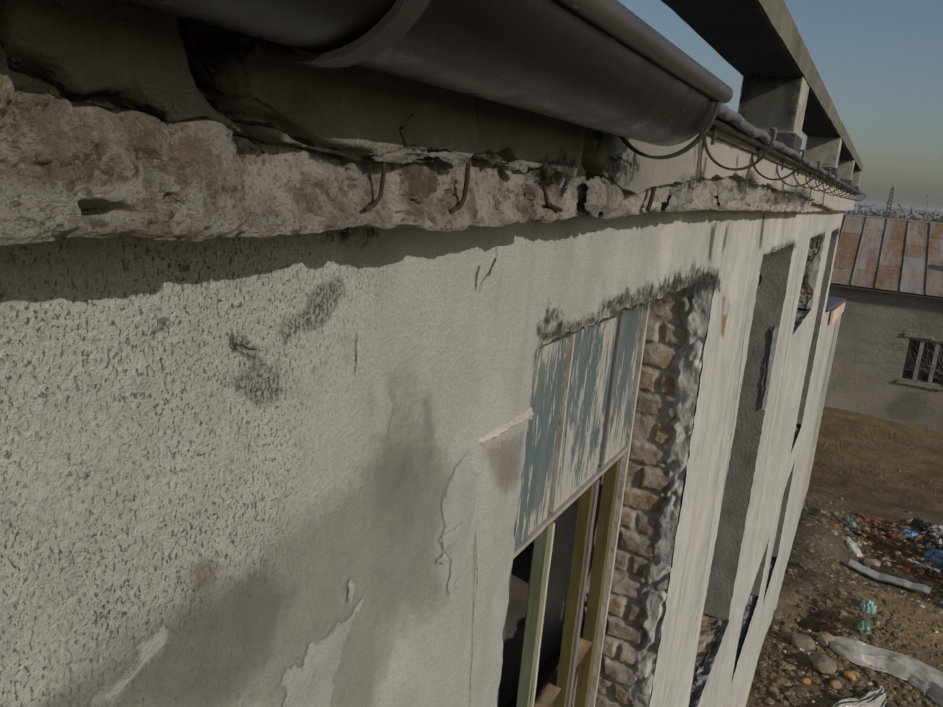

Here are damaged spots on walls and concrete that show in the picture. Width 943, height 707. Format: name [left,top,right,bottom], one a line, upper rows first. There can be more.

crack [6,54,177,132]
spalling [178,19,255,101]
crack [206,97,363,161]
spalling [0,43,812,246]
crack [476,248,498,290]
flaking render [538,261,721,707]
flaking render [280,580,364,707]
flaking render [689,620,729,707]